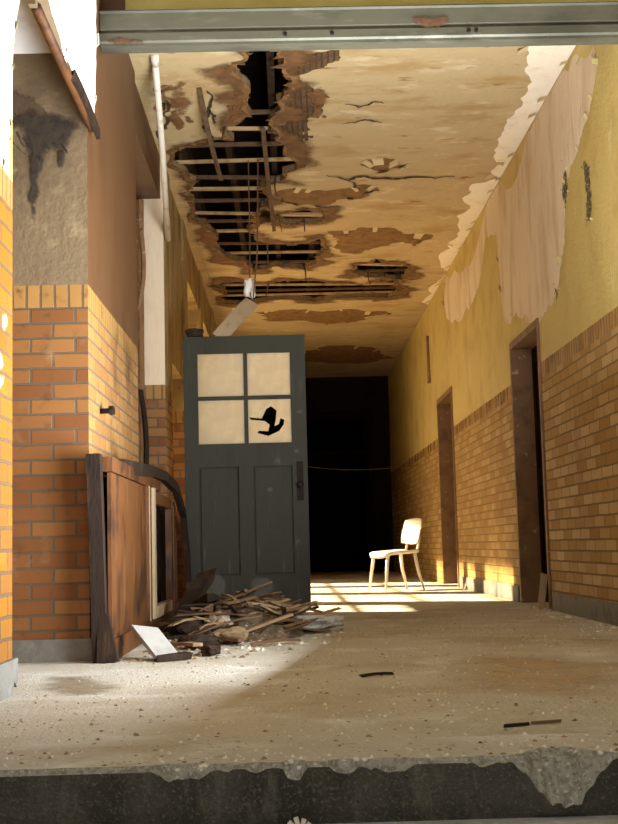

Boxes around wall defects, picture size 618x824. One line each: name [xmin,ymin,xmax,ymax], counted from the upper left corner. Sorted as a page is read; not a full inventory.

flaking render [49,0,99,112]
flaking render [0,0,20,175]
leakage [13,91,78,214]
peeling [360,157,410,174]
peeling [274,184,380,208]
flaking render [422,45,598,324]
peeling [327,227,434,256]
spalling [149,763,217,782]
spalling [282,759,307,780]
spalling [328,757,416,774]
spalling [510,746,615,807]